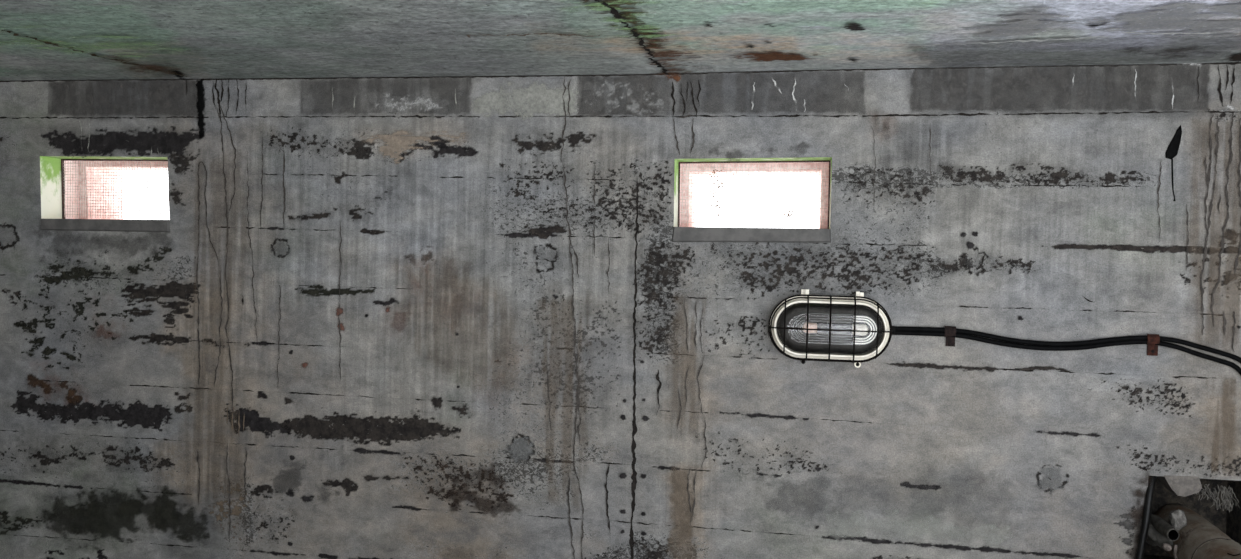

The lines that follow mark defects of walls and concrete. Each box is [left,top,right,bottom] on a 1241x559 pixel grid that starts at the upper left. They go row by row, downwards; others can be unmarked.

crack [942,62,1139,70]
crack [1155,162,1163,242]
crack [1158,62,1241,351]
crack [0,0,933,559]
crack [962,247,988,276]
crack [1037,464,1069,492]
damp [31,486,209,548]